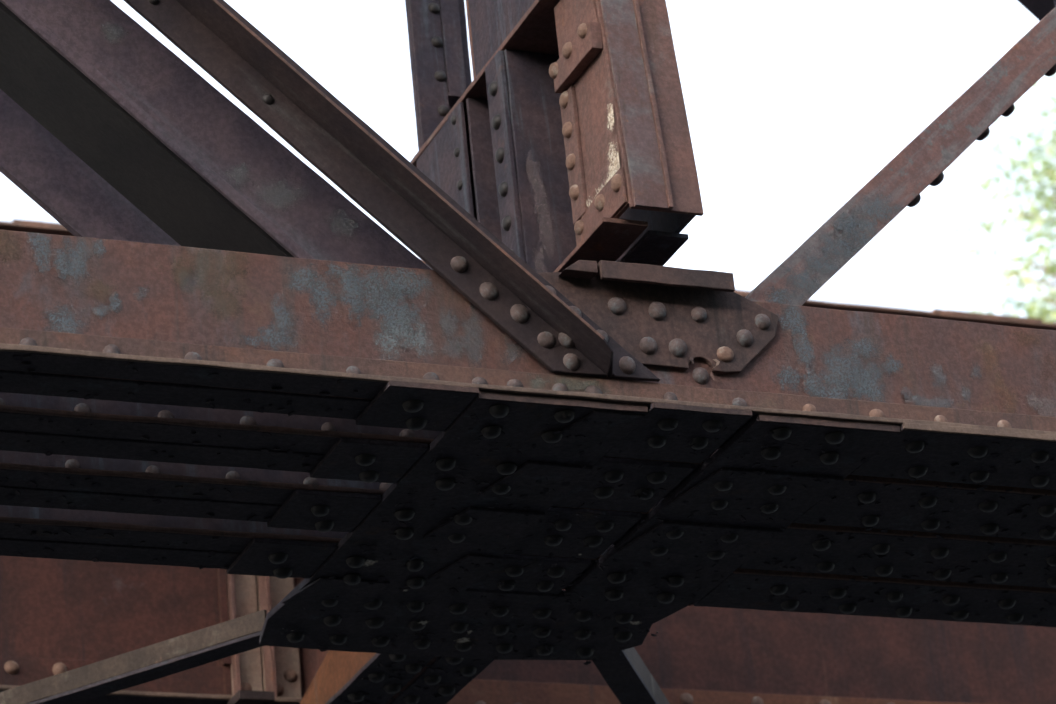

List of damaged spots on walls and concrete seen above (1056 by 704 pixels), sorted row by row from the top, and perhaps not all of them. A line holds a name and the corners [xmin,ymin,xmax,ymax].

peeling [27,232,106,287]
peeling [763,193,903,396]